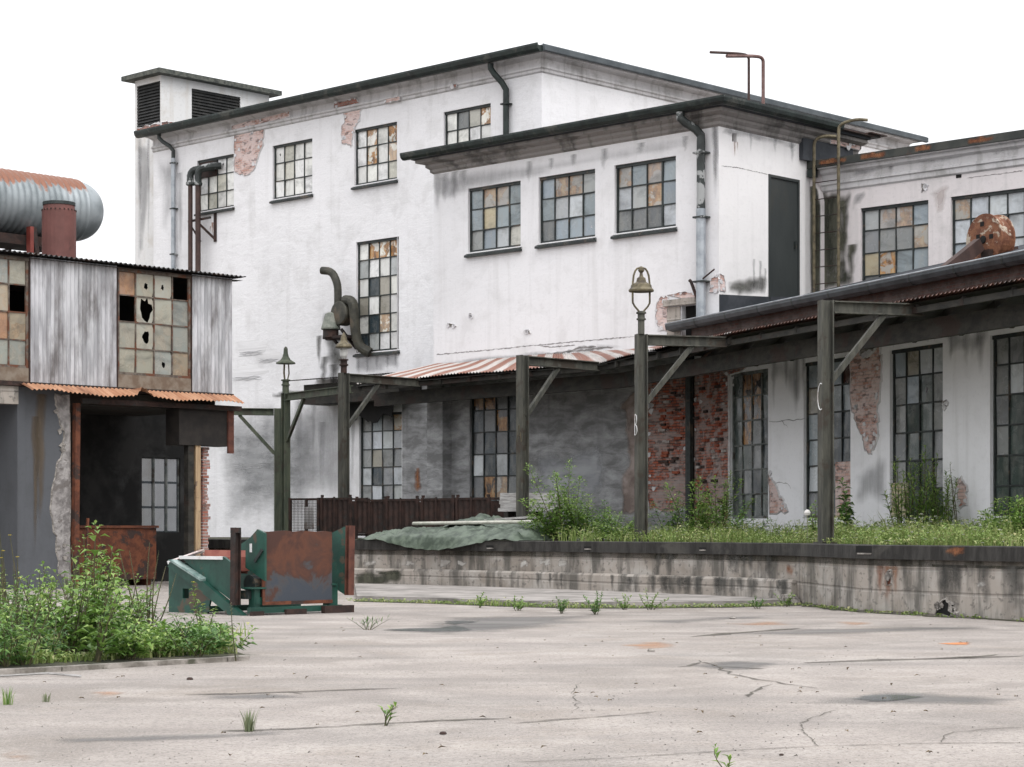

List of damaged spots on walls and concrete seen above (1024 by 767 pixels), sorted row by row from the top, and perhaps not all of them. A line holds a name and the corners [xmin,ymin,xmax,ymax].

peeling [232,111,289,176]
peeling [334,98,363,148]
leakage [811,186,856,274]
peeling [655,291,695,332]
peeling [849,347,883,455]
flaking render [648,367,747,529]
peeling [49,393,71,581]
peeling [768,470,789,515]
peeling [954,475,969,510]
spalling [934,597,960,617]